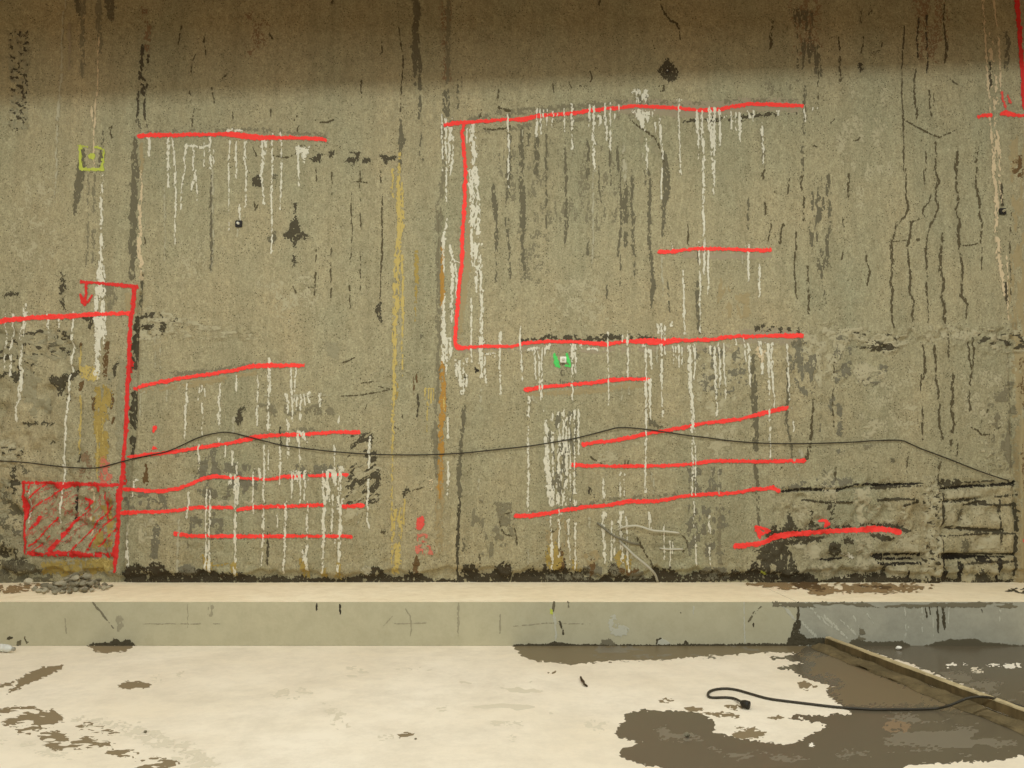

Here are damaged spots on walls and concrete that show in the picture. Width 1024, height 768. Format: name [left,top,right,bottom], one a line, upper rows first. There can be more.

water stain [7,0,327,523]
corrosion [390,152,419,575]
water stain [122,0,1024,583]
water stain [513,646,1024,768]
spalling [817,396,845,454]
crack [761,0,1020,583]
spalling [839,484,1001,583]